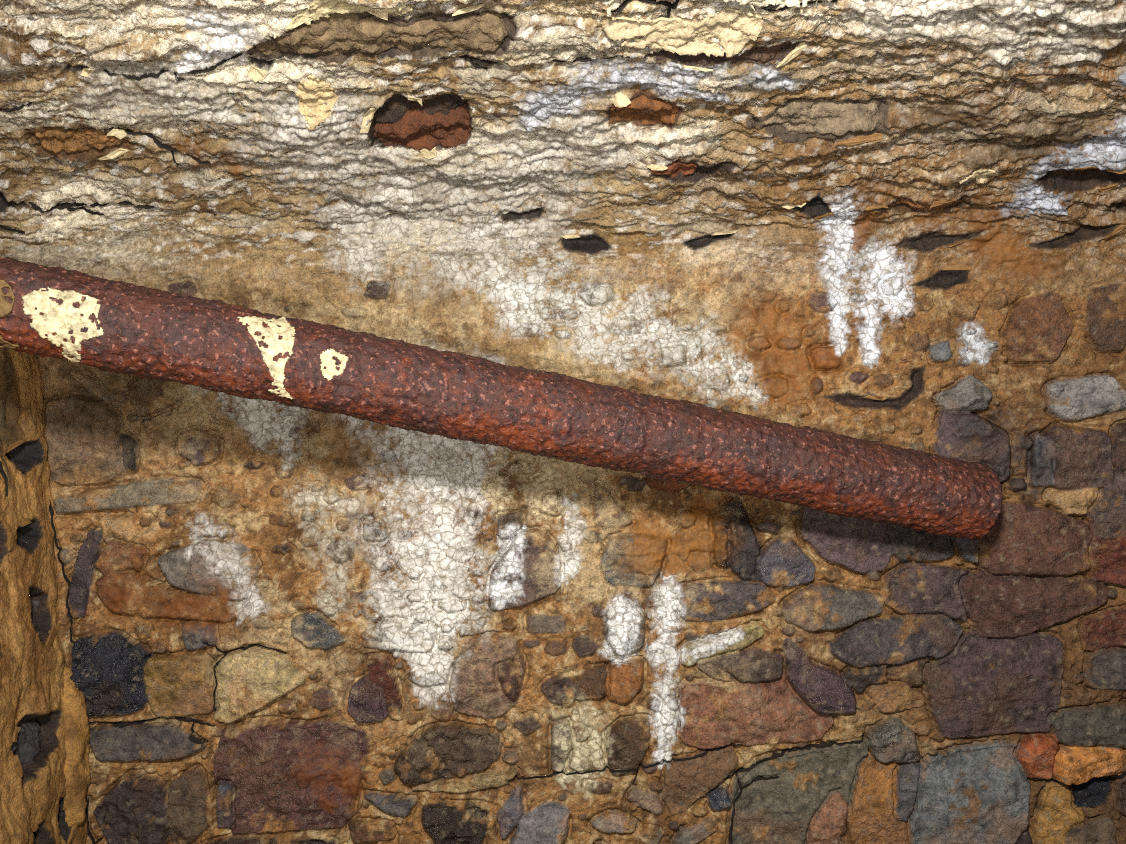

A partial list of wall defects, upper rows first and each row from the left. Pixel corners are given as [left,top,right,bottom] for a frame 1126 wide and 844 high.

crack [104,53,242,81]
spalling [244,0,521,82]
crack [603,0,679,18]
peeling [296,75,338,131]
spalling [360,90,475,159]
crack [0,201,155,233]
corrosion [852,186,897,253]
corrosion [918,207,1044,277]
damp [817,188,914,368]
corrosion [759,307,844,403]
damp [291,414,586,708]
damp [601,573,744,769]